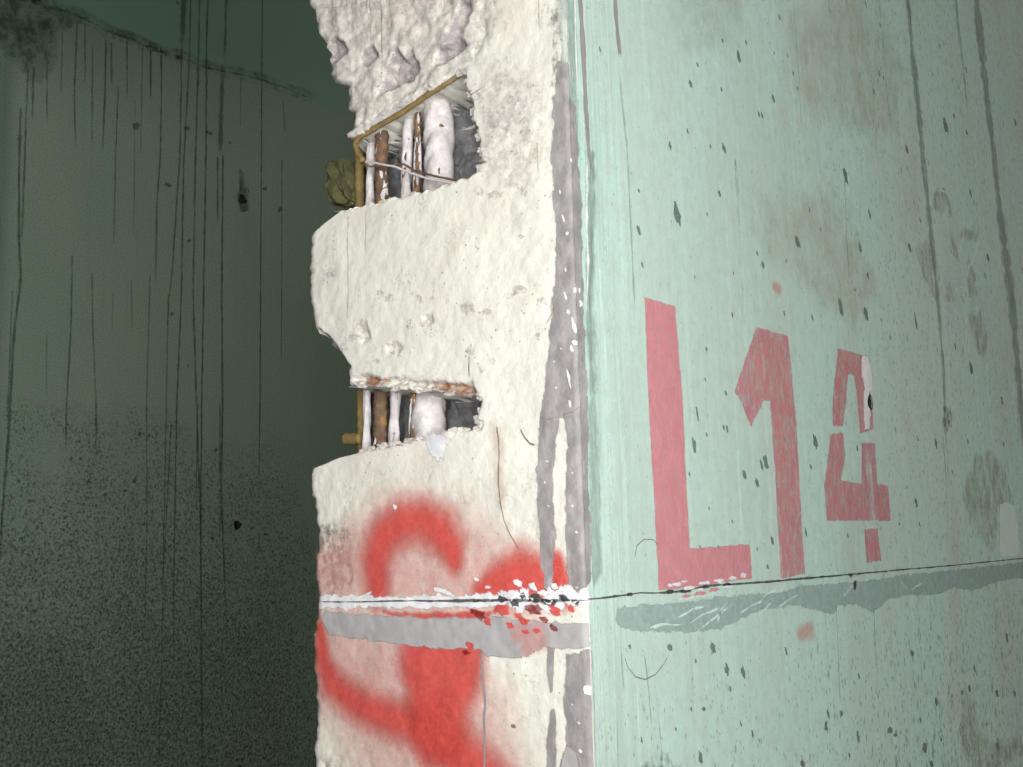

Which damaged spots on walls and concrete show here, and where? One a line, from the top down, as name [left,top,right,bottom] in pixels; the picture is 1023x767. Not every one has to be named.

spalling [385,47,420,90]
spalling [441,2,473,62]
water stain [173,76,224,253]
spalling [347,122,370,138]
spalling [365,122,426,205]
spalling [445,65,487,186]
spalling [357,377,484,453]
crack [323,558,1023,607]